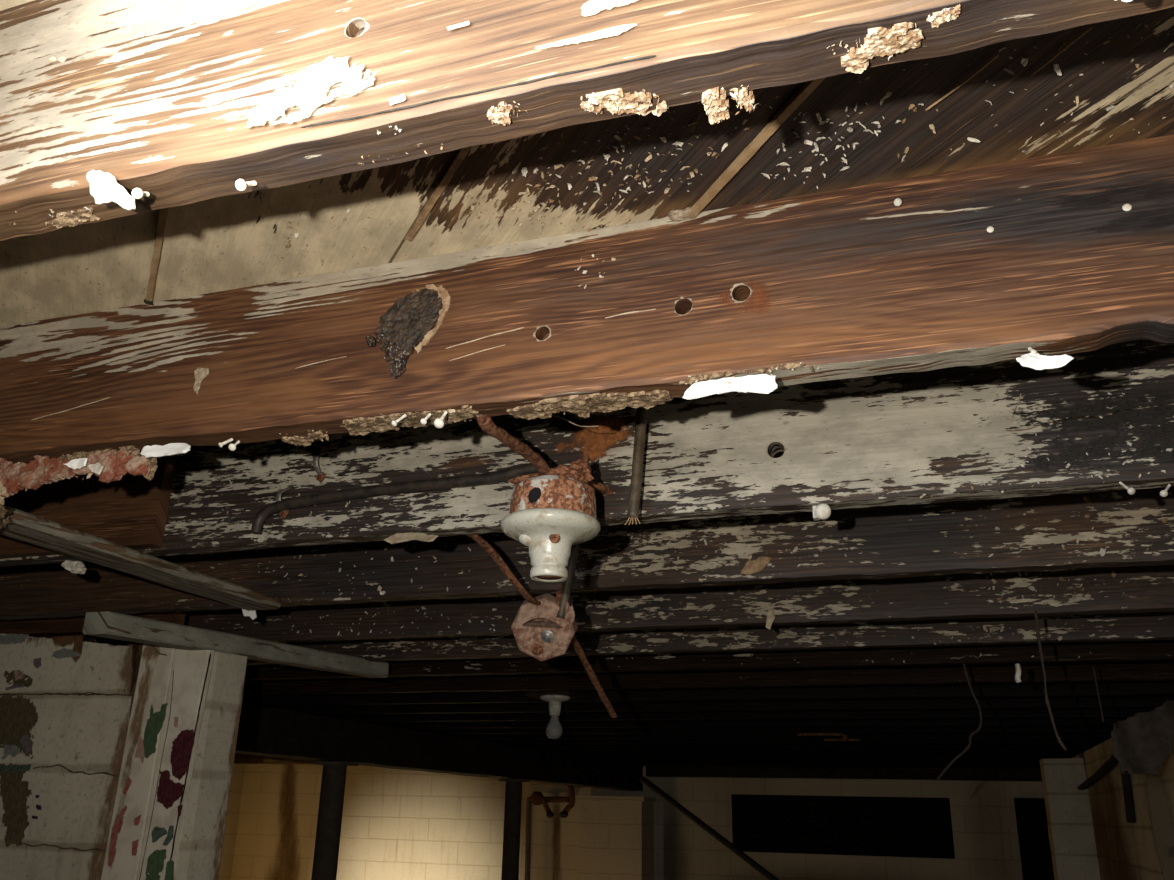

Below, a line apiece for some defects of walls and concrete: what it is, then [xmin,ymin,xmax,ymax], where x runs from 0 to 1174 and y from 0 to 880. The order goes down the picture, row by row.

peeling [535,24,636,49]
peeling [826,4,960,83]
peeling [243,56,375,128]
peeling [465,85,779,232]
peeling [761,92,938,189]
peeling [45,170,136,229]
peeling [141,443,191,458]
peeling [341,405,483,435]
corrosion [508,413,631,487]
peeling [507,362,820,420]
peeling [1016,353,1074,370]
spalling [0,648,81,847]